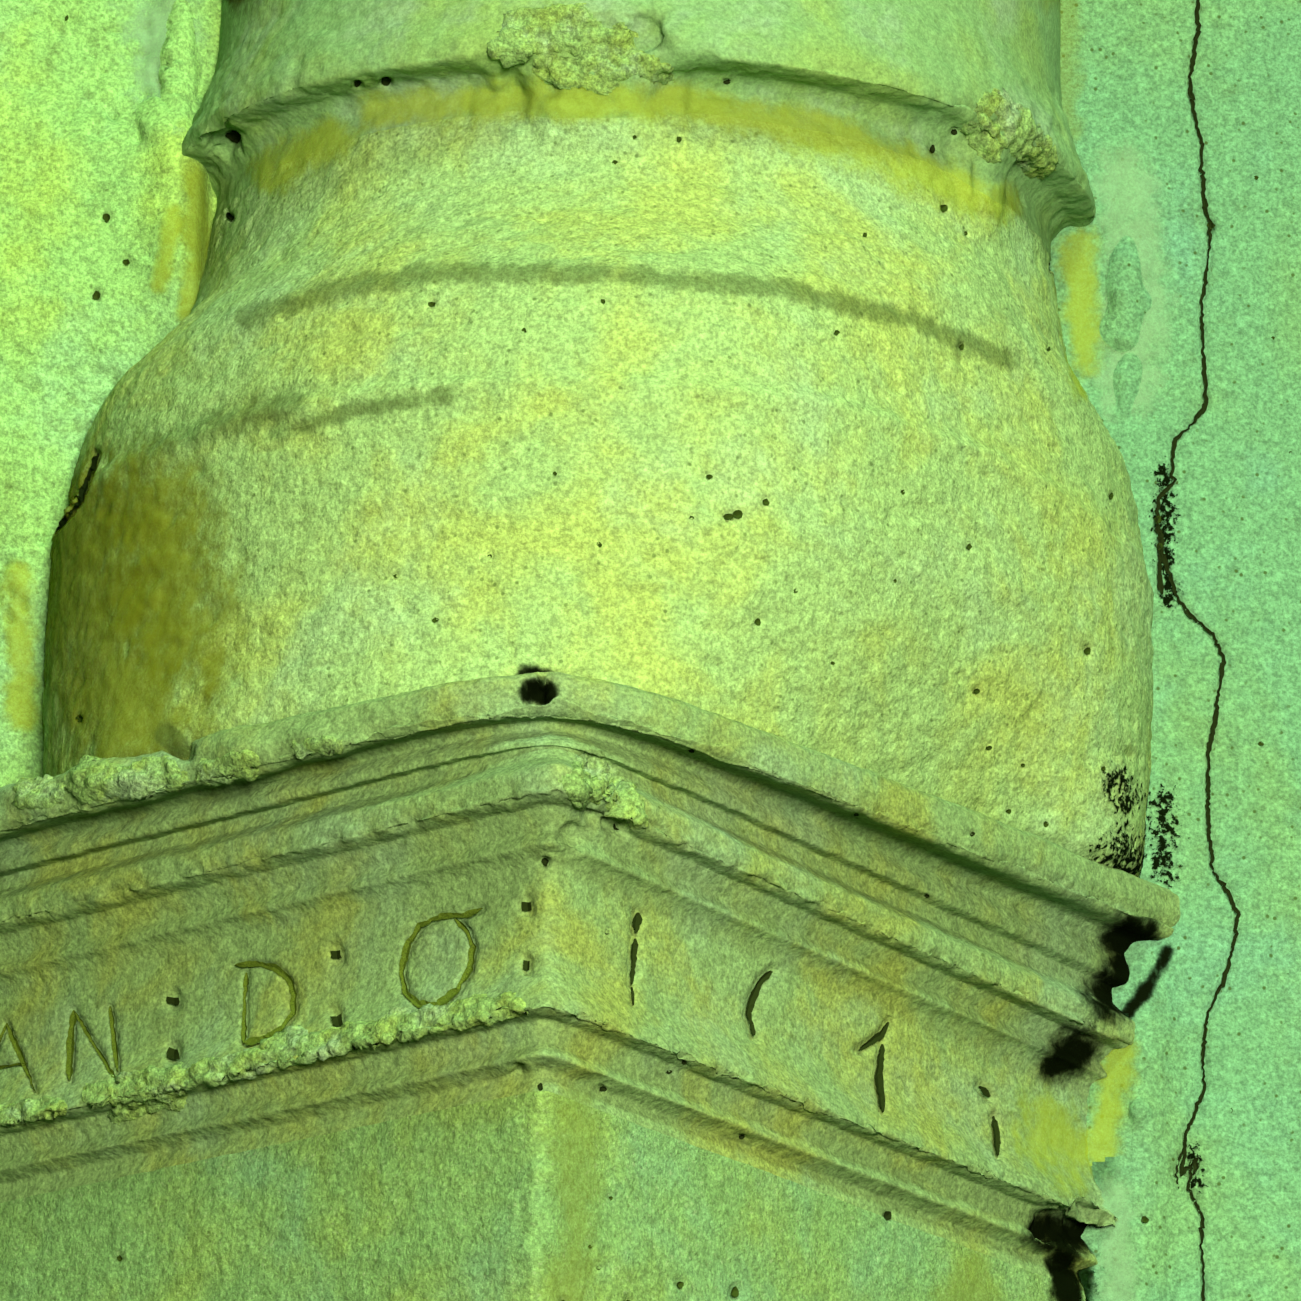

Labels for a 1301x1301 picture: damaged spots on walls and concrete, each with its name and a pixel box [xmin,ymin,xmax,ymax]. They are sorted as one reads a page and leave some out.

spalling [483,3,675,95]
spalling [951,87,1058,180]
crack [1154,0,1241,1301]
mould [1083,754,1190,888]
damp [1040,914,1173,1080]
damp [1024,1212,1088,1301]